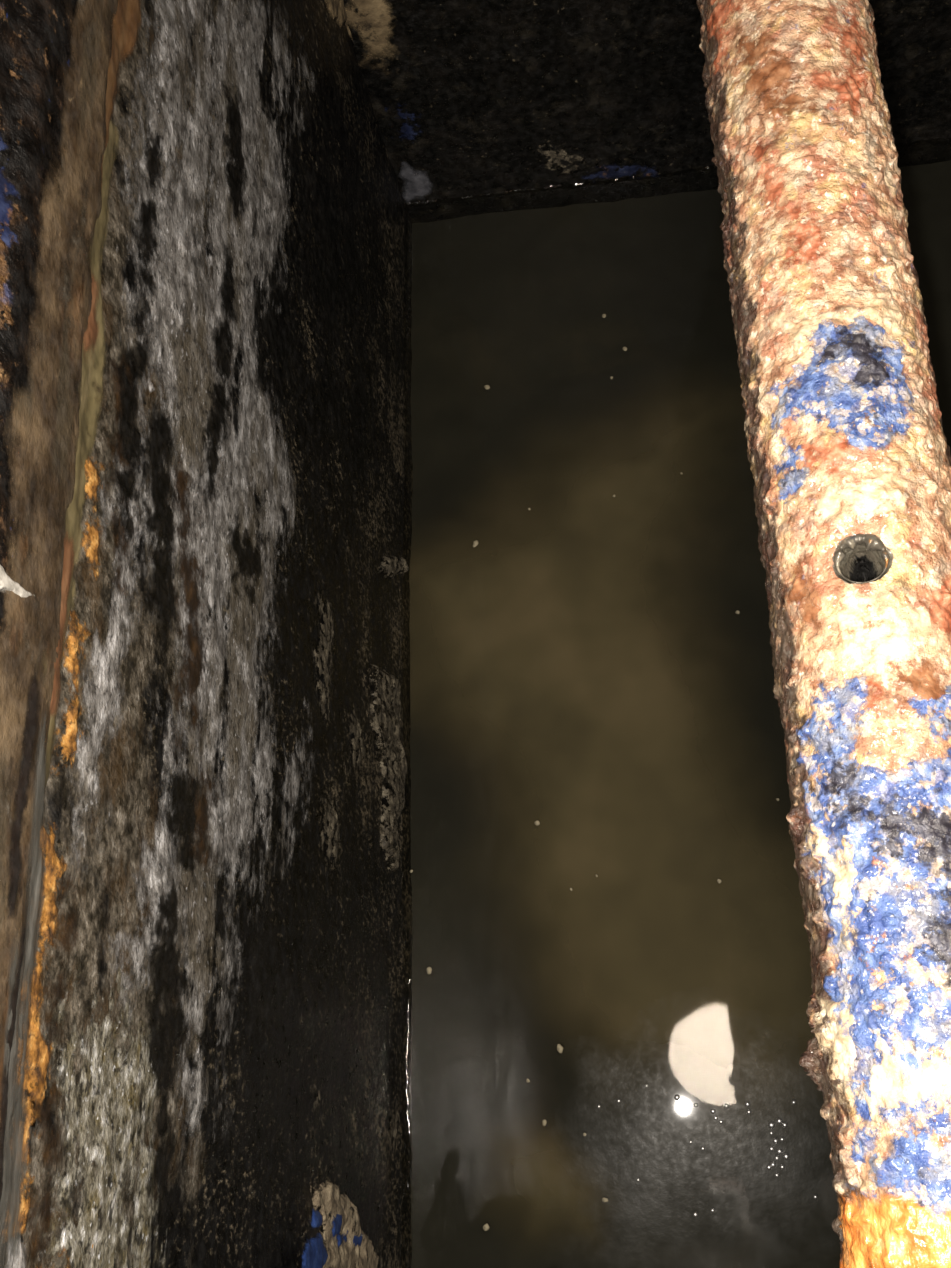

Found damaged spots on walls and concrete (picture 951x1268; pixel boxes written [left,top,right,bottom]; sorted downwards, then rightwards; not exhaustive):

rust [54,611,88,767]
rust [81,356,133,592]
leakage [0,0,314,1268]
rust [171,470,206,732]
rust [696,0,951,1268]
rust [189,771,215,873]
rust [1,826,78,1268]